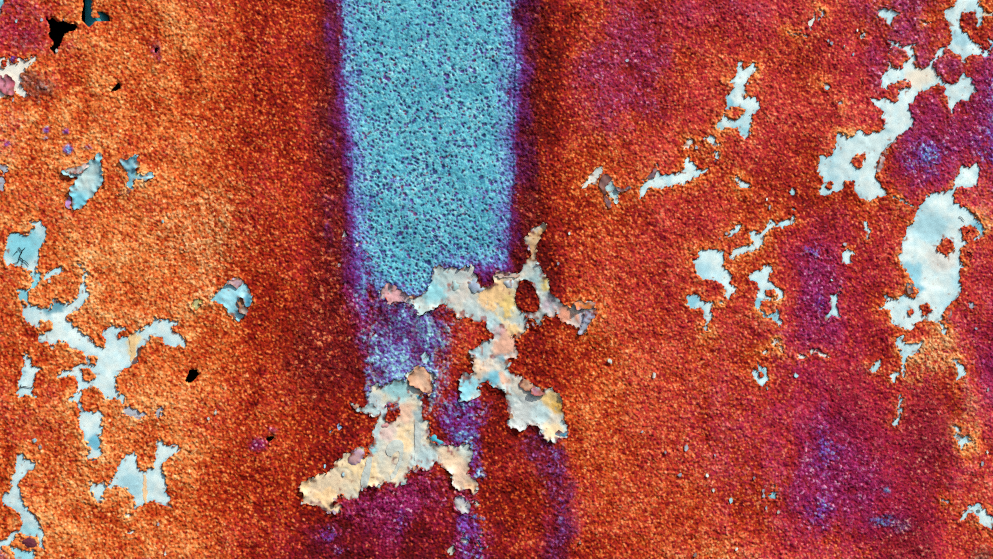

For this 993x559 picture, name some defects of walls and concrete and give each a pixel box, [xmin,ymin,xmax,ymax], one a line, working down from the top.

rust [20,70,53,97]
peeling [3,221,186,461]
peeling [89,439,181,518]
rust [160,185,250,298]
rust [276,0,365,401]
peeling [298,351,480,514]
peeling [378,222,598,443]
rust [520,0,542,255]
peeling [582,62,760,208]
peeling [686,208,795,331]
peeling [817,0,993,383]
rust [881,328,971,559]